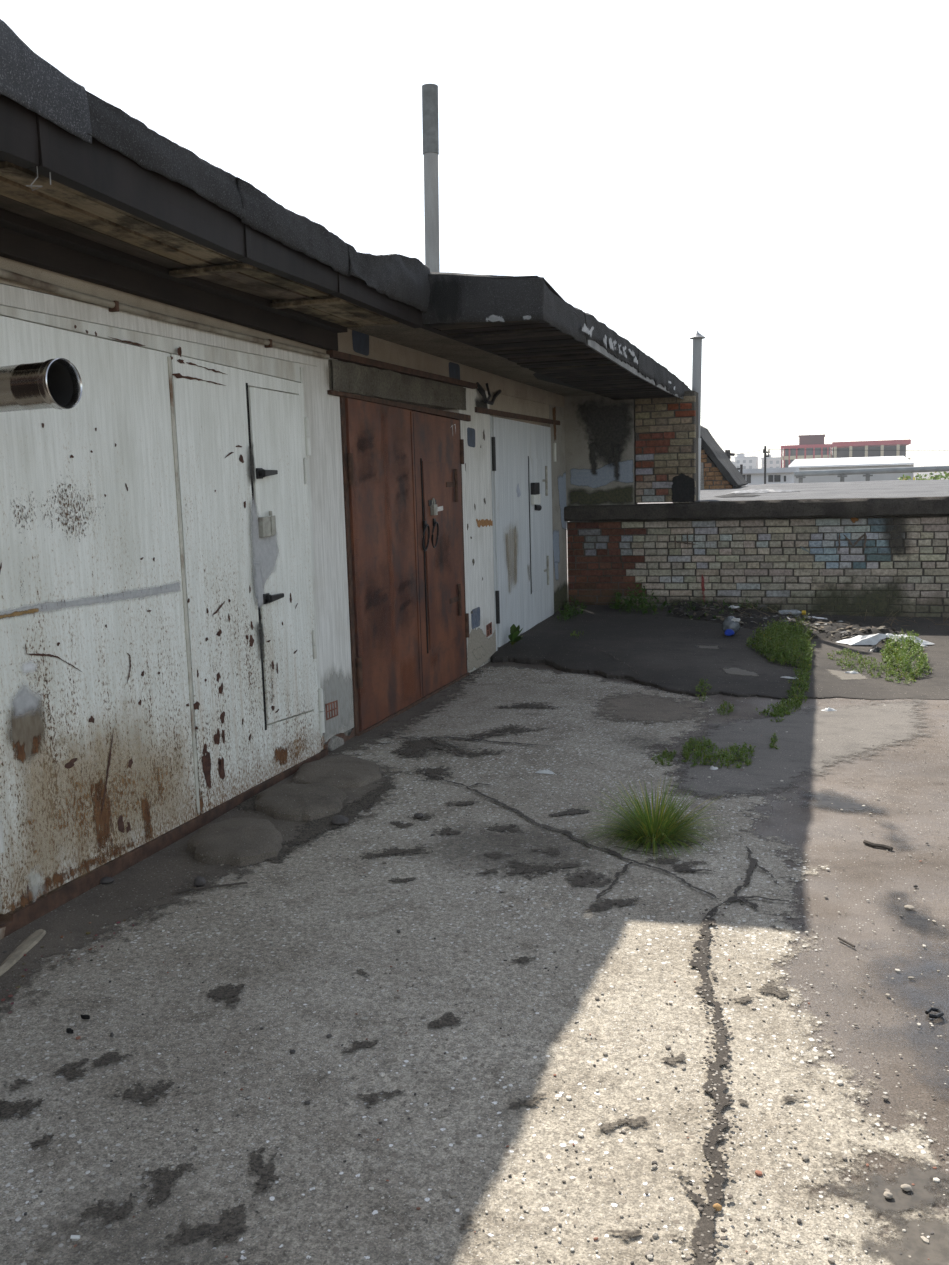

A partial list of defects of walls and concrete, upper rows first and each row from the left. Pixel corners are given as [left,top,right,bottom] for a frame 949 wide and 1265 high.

water stain [589,443,597,475]
corrosion [10,475,105,544]
corrosion [0,562,39,619]
corrosion [9,653,49,763]
corrosion [272,717,325,776]
crack [380,733,557,747]
corrosion [12,748,180,913]
crack [415,770,789,1265]